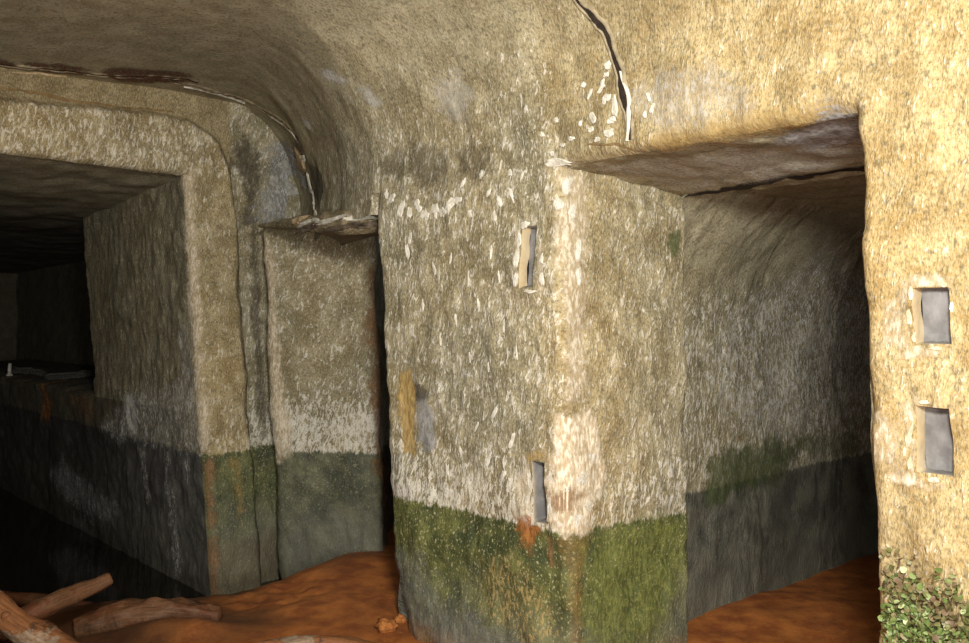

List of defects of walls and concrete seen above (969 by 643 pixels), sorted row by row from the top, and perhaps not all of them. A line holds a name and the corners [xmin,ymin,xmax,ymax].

corrosion [104,68,191,83]
crack [572,0,865,197]
spalling [252,136,378,235]
corrosion [517,517,540,540]